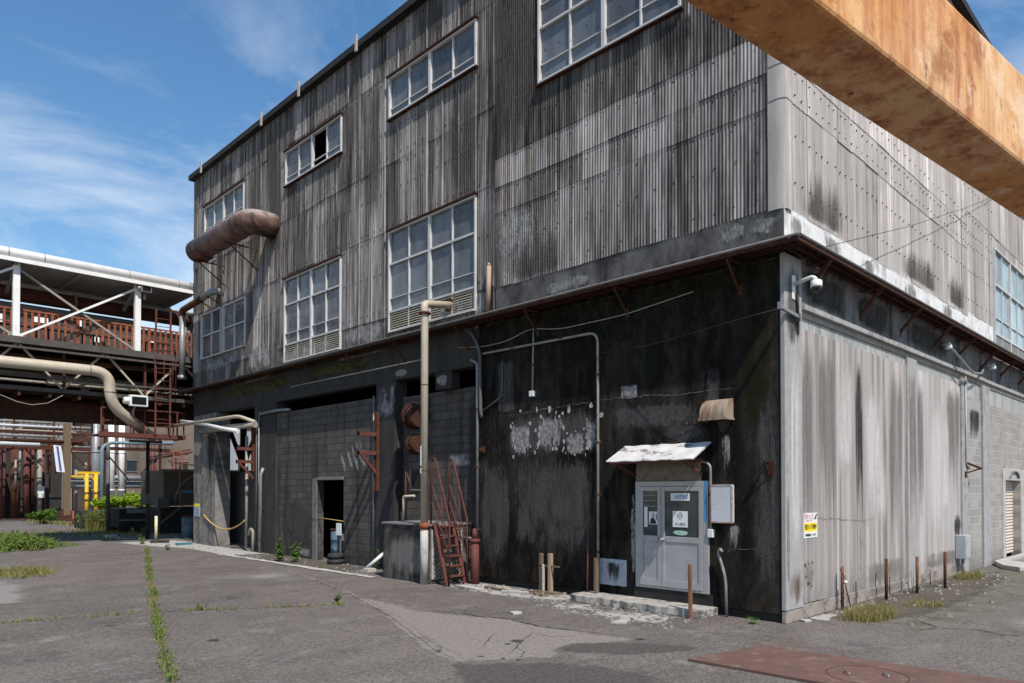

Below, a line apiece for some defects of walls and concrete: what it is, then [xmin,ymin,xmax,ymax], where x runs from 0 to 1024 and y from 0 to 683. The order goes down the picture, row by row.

water stain [791,183,842,253]
water stain [905,259,934,297]
water stain [945,285,963,316]
water stain [912,325,948,356]
peeling [510,402,603,459]
water stain [450,402,596,561]
water stain [755,360,979,583]